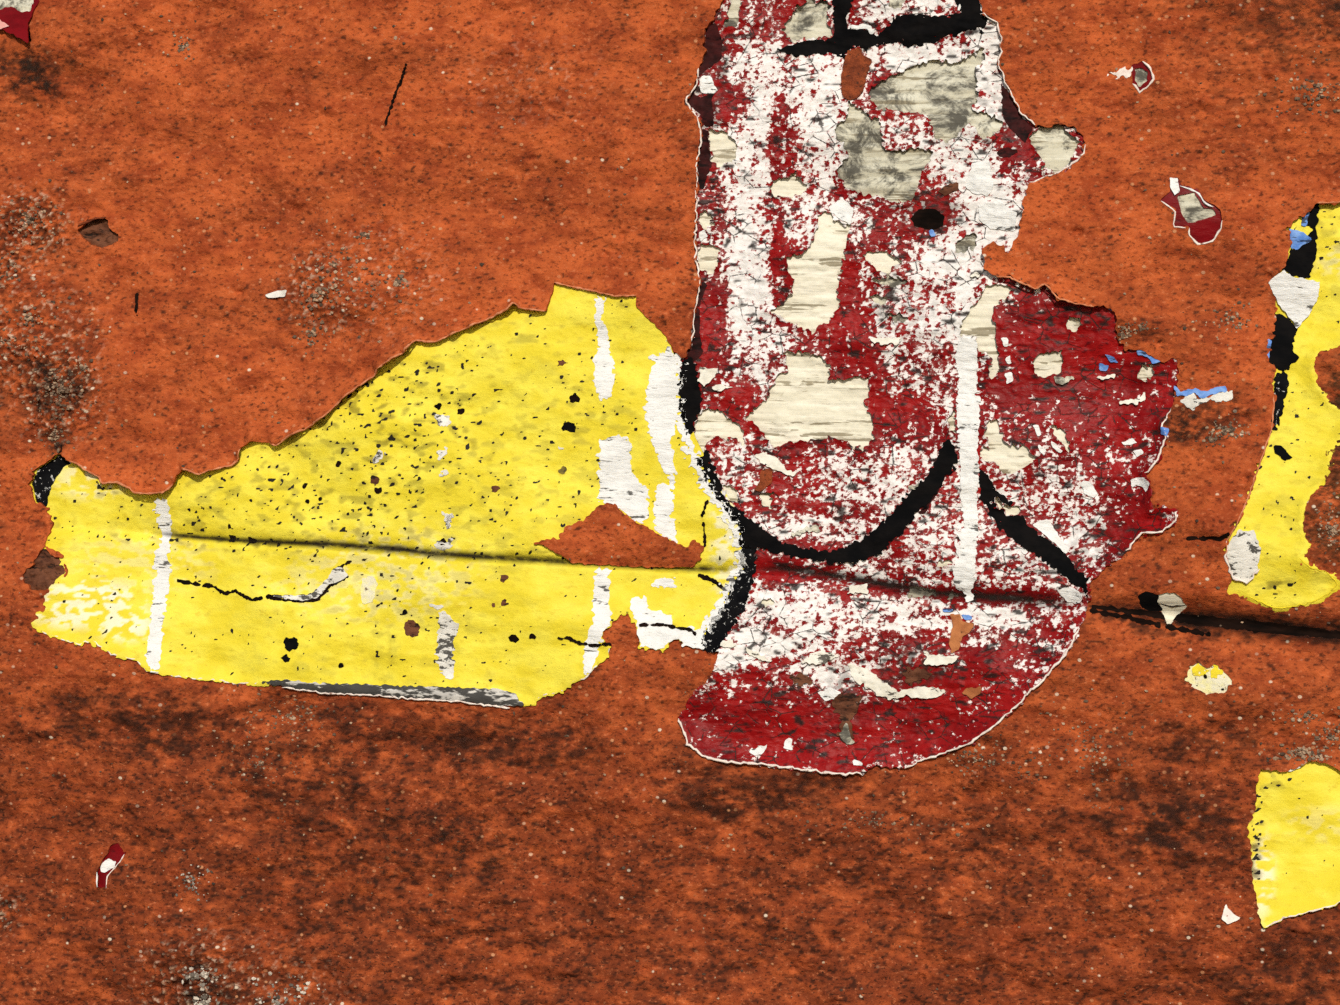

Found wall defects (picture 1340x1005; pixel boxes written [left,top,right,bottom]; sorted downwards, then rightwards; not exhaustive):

peeling [0,0,40,43]
peeling [24,0,1233,776]
peeling [1223,201,1340,613]
crack [1090,605,1340,642]
peeling [96,843,126,888]
peeling [1247,761,1340,928]
peeling [1222,905,1240,924]